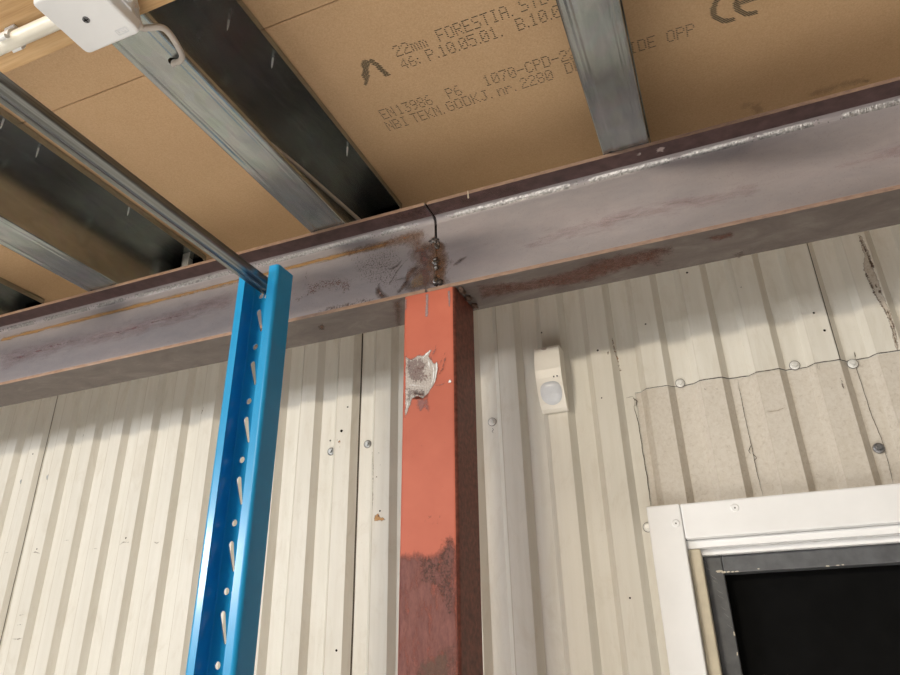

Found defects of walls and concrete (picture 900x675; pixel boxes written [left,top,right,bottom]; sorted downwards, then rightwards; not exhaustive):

corrosion [284,233,445,289]
corrosion [481,248,671,297]
corrosion [1,279,239,341]
peeling [405,350,451,415]
crack [628,350,899,505]